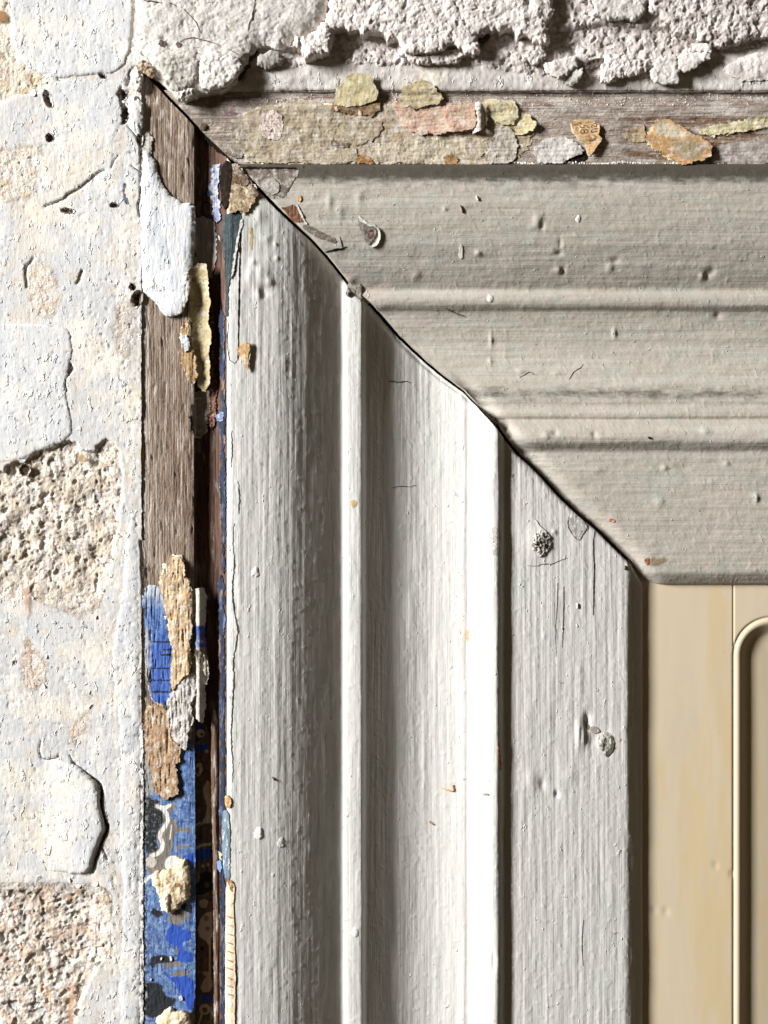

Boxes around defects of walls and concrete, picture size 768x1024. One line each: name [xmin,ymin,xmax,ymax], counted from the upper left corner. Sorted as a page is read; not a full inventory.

spalling [276,0,768,87]
spalling [238,49,260,81]
flaking render [485,126,519,165]
peeling [177,272,191,314]